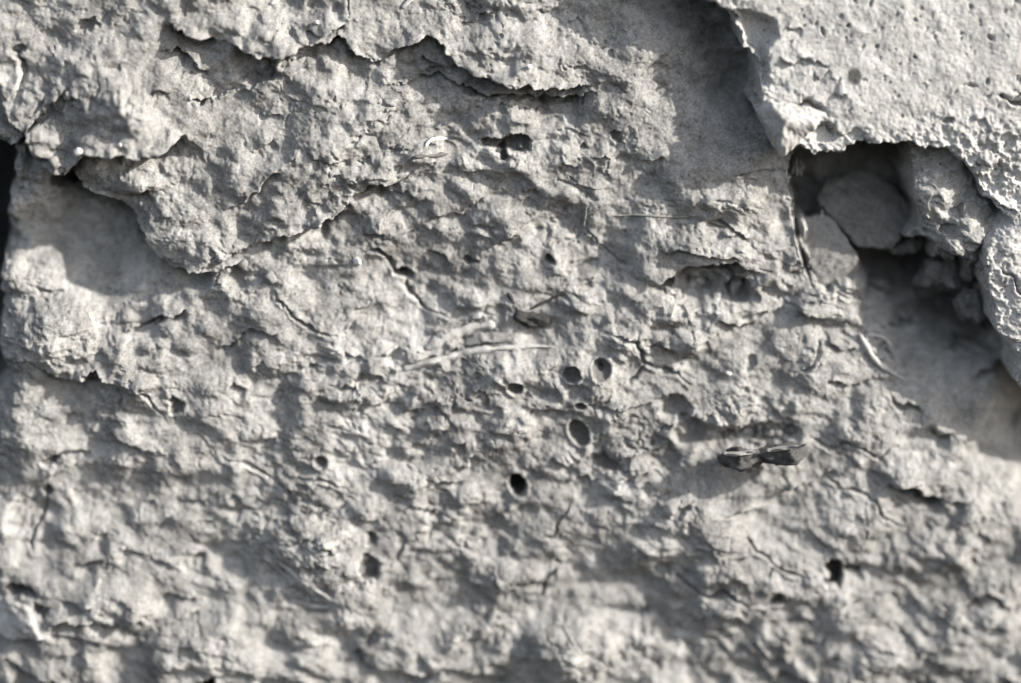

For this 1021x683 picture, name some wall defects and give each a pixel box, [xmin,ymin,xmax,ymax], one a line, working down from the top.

spalling [708,0,777,151]
crack [998,93,1021,105]
spalling [786,137,1021,428]
spalling [823,558,860,586]